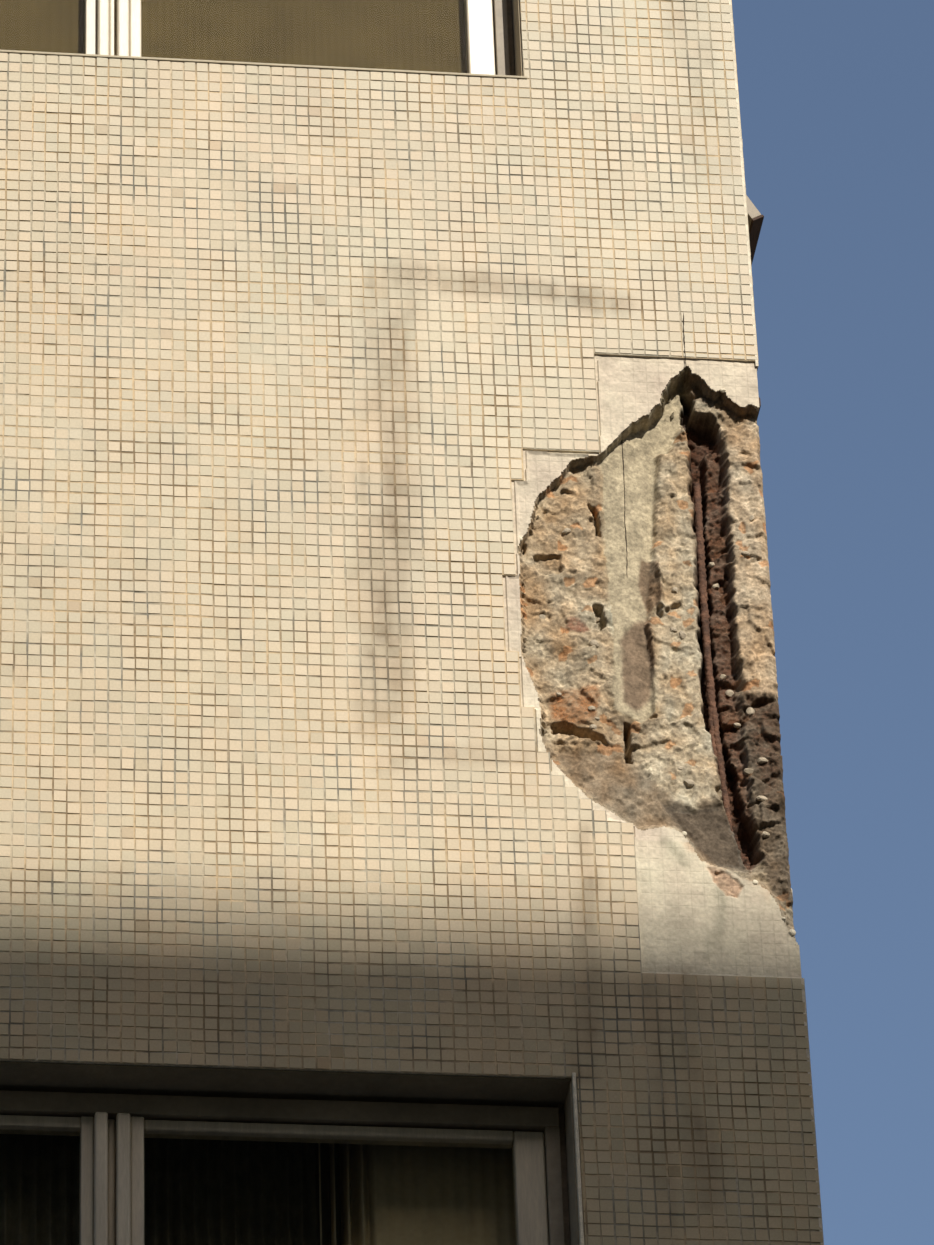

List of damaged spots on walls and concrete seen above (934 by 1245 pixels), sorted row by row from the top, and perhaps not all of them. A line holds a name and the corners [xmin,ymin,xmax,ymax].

spalling [502,355,802,978]